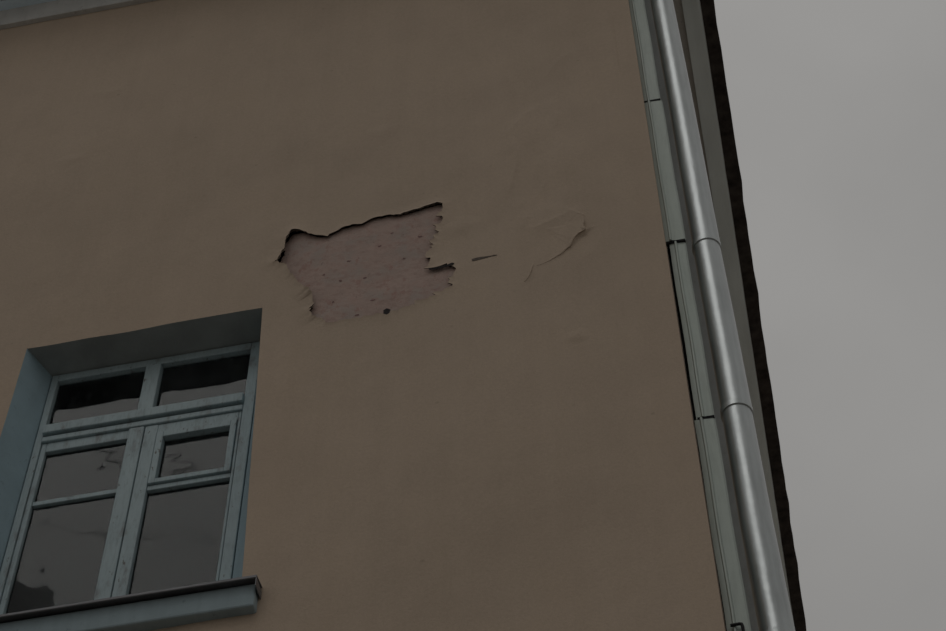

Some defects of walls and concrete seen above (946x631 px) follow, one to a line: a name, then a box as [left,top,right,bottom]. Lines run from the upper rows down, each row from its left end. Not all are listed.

flaking render [259,195,471,333]